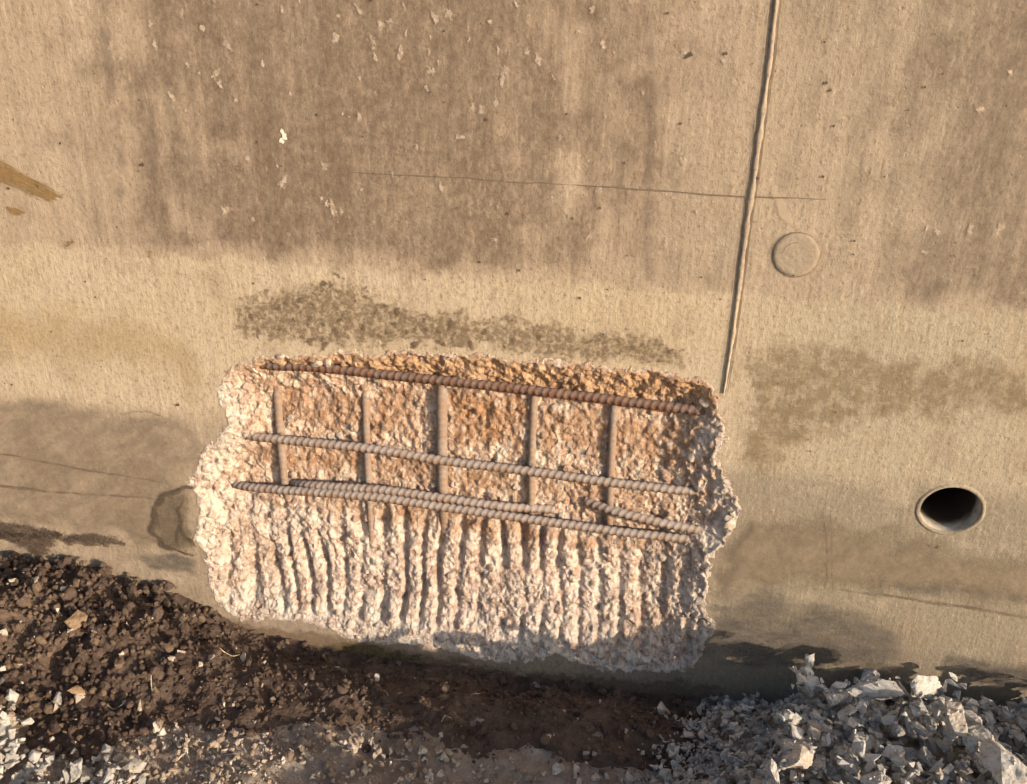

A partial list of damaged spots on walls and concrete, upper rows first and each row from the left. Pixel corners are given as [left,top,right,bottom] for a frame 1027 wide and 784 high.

water stain [236,272,685,367]
corrosion [249,354,715,447]
corrosion [546,413,677,455]
water stain [747,348,1027,466]
water stain [0,523,125,556]
water stain [143,554,195,573]
spalling [186,348,742,673]
water stain [703,593,900,670]
water stain [955,660,1027,689]